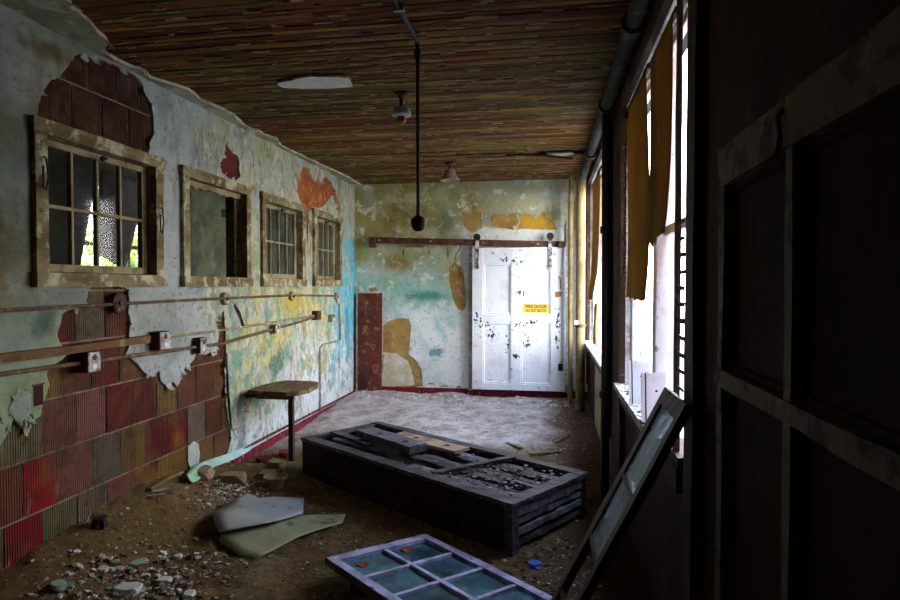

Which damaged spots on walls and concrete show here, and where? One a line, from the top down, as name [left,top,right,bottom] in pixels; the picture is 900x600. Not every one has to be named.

spalling [37,53,154,152]
spalling [219,142,240,182]
spalling [297,167,340,238]
peeling [462,204,557,232]
peeling [382,318,461,388]
peeling [473,312,538,359]
spalling [0,287,229,571]